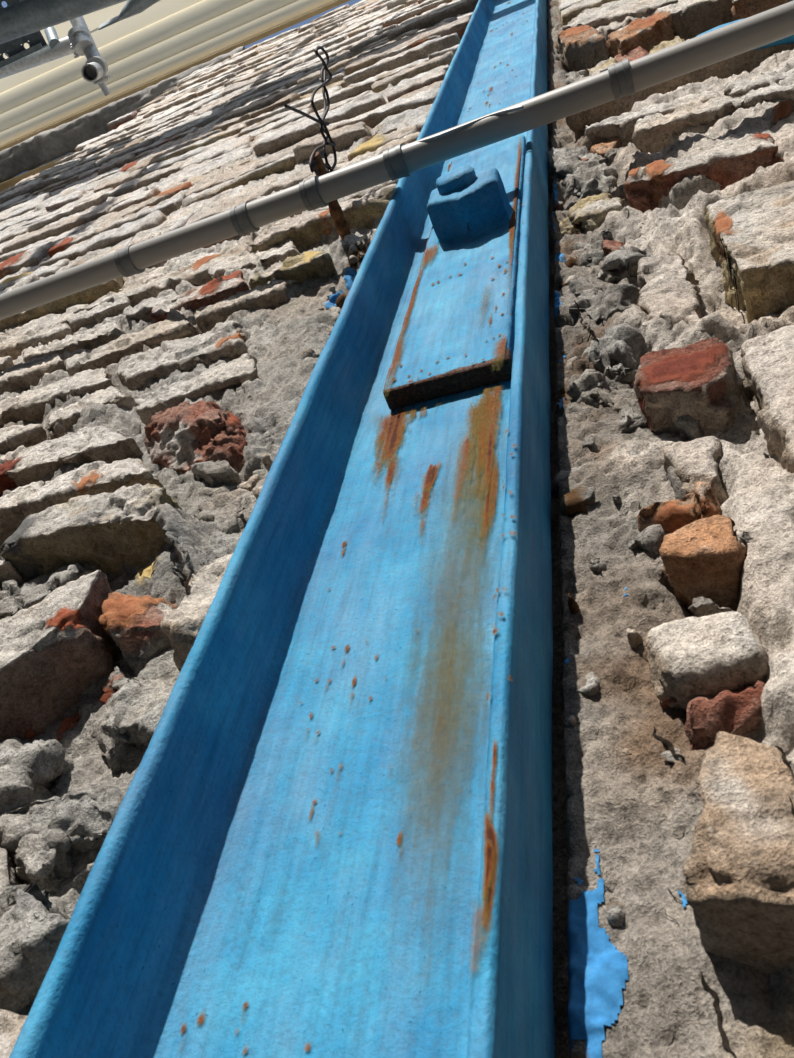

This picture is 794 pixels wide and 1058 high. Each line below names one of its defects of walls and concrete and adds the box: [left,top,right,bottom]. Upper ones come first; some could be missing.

rust [491,141,522,279]
rust [385,245,466,391]
rust [465,334,506,364]
crack [713,222,754,334]
rust [375,406,426,502]
rust [419,462,440,531]
rust [455,385,511,534]
crack [775,745,791,770]
rust [473,742,498,968]
crack [701,973,737,1058]